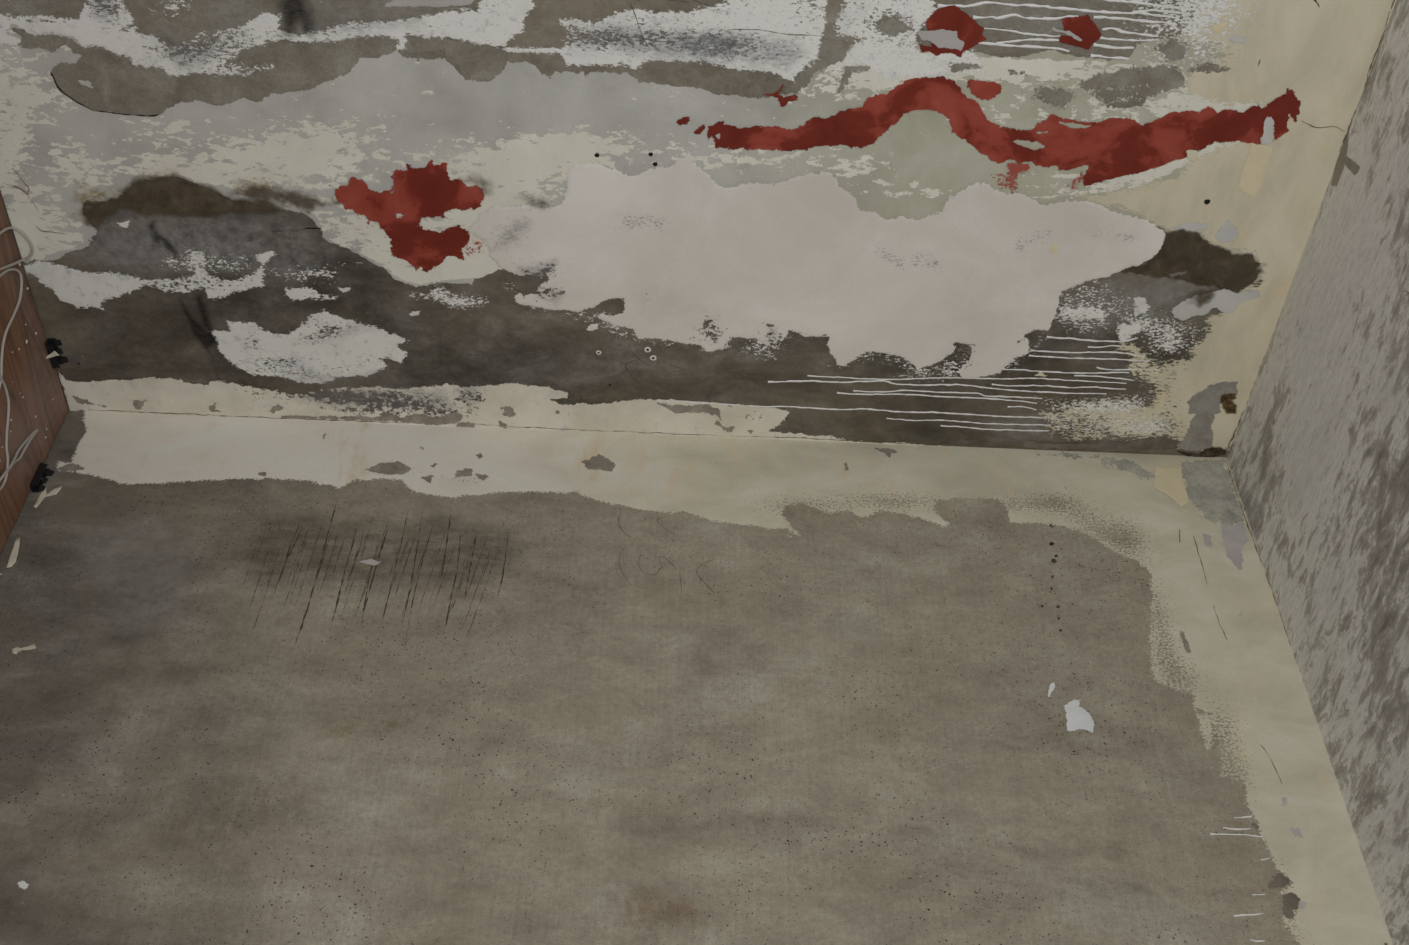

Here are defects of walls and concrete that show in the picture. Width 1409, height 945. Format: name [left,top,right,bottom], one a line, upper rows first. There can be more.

leakage [80,176,339,226]
peeling [0,0,1397,457]
leakage [1122,229,1261,306]
peeling [56,373,1393,945]